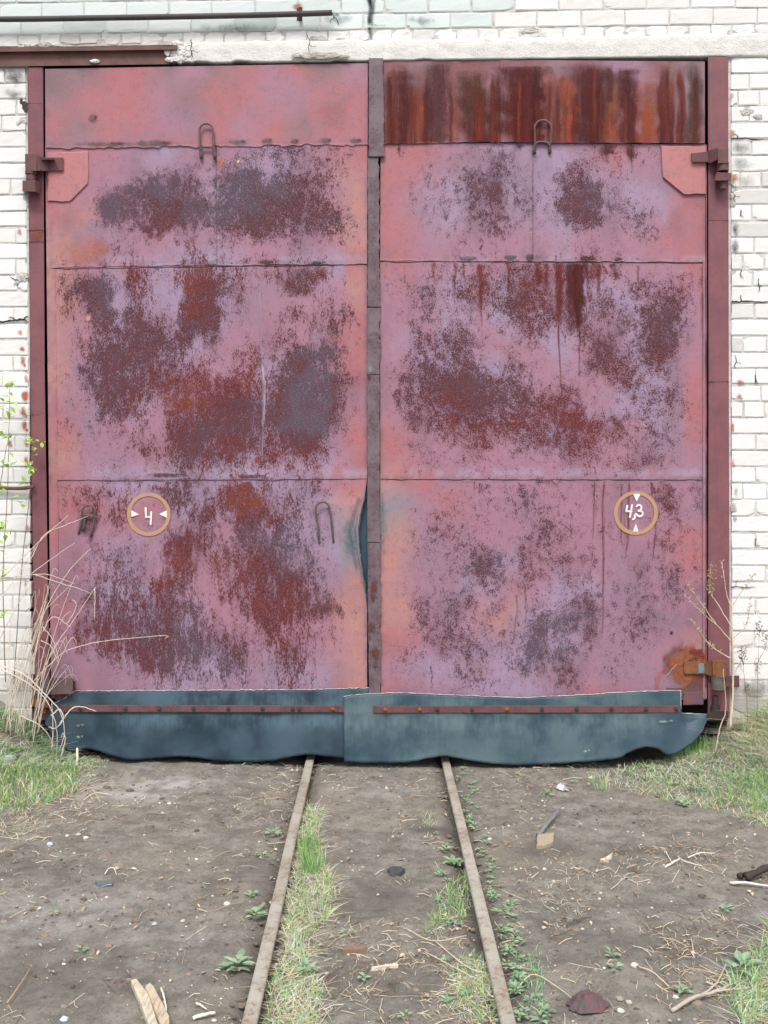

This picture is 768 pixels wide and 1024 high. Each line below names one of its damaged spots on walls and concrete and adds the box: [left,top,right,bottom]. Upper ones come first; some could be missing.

rust [56,145,372,690]
rust [384,64,705,695]